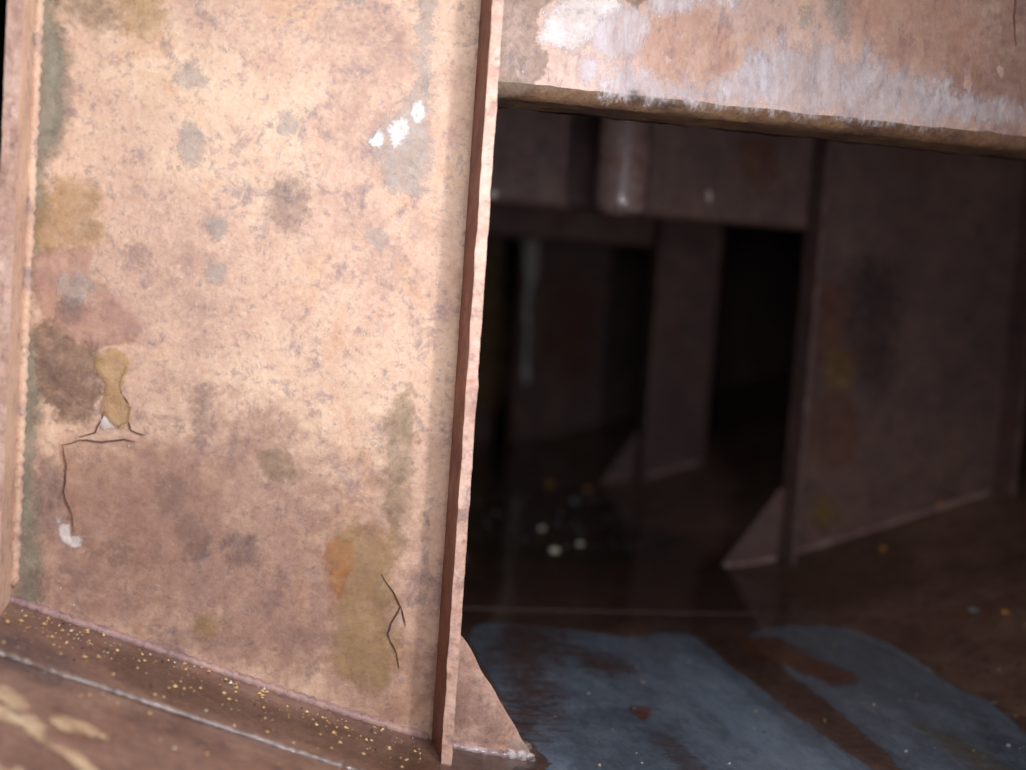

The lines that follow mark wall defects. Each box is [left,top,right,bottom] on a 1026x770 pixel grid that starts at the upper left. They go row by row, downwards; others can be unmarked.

leakage [521,0,1026,126]
spalling [35,321,131,430]
crack [62,370,145,532]
crack [381,574,406,668]